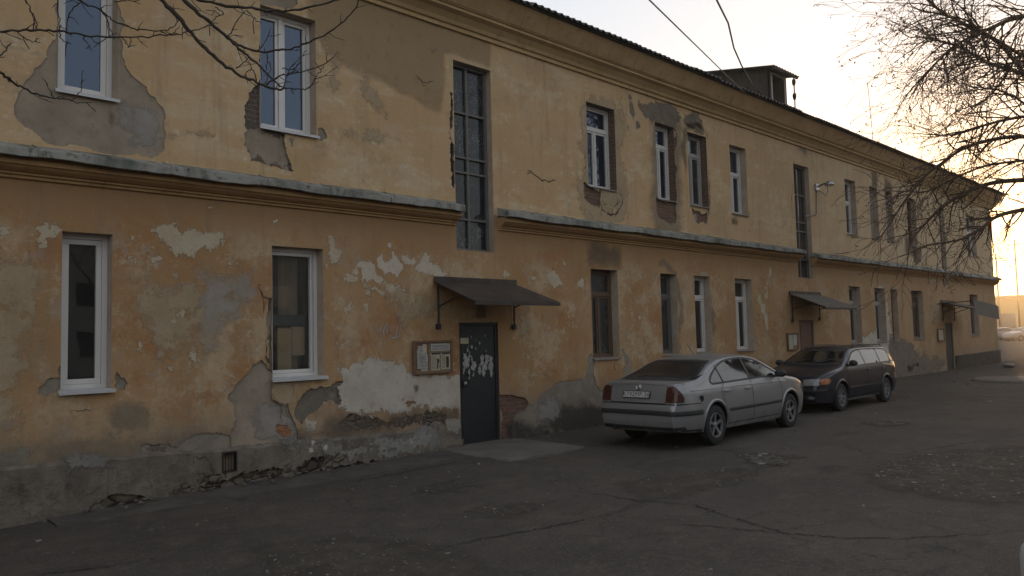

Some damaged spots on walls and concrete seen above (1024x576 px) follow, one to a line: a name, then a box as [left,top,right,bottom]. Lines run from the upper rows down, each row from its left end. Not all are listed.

flaking render [244,84,294,172]
peeling [577,94,629,223]
peeling [124,222,256,388]
peeling [323,235,455,328]
flaking render [38,366,60,396]
peeling [168,356,461,496]